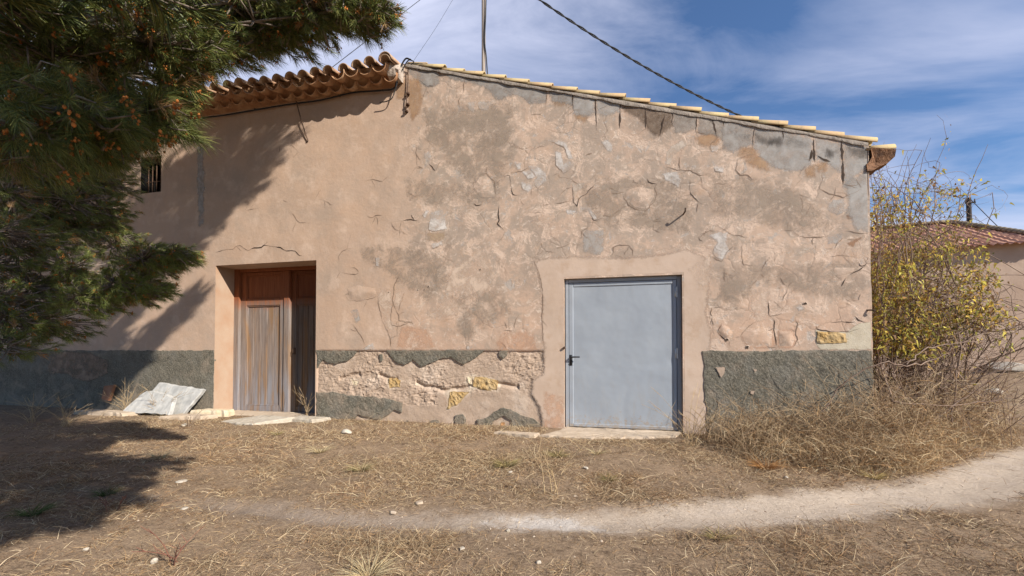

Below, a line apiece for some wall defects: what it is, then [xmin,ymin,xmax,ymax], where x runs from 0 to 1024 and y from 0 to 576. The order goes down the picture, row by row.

crack [218,216,306,256]
crack [370,148,439,238]
crack [474,91,799,348]
crack [785,139,869,300]
crack [353,276,413,346]
flaking render [316,290,545,427]